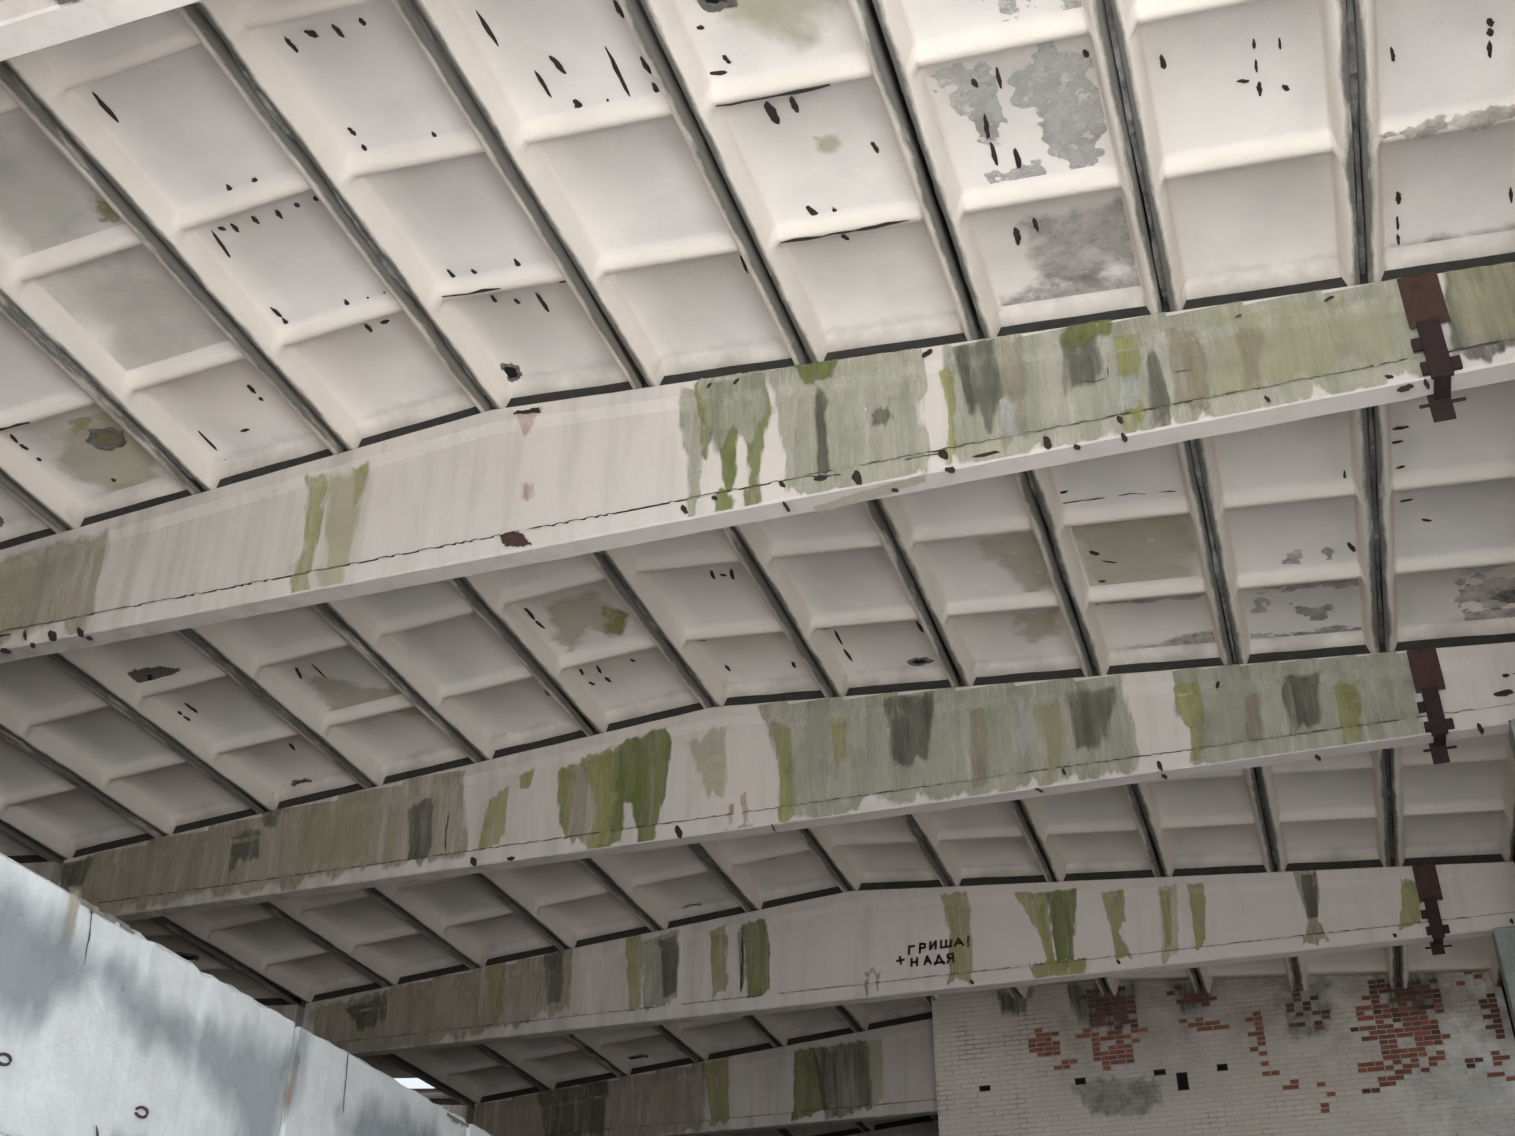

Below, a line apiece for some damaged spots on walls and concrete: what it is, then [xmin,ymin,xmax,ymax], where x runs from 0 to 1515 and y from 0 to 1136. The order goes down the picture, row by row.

peeling [931,41,1107,184]
spalling [1013,217,1039,246]
water stain [944,277,1430,462]
water stain [1445,262,1515,362]
water stain [680,348,930,516]
water stain [596,728,672,848]
water stain [760,675,1139,818]
water stain [1173,651,1420,765]
flaking render [1028,986,1147,1070]
flaking render [1167,985,1299,1090]
flaking render [1350,978,1451,1094]
flaking render [1456,971,1515,1081]